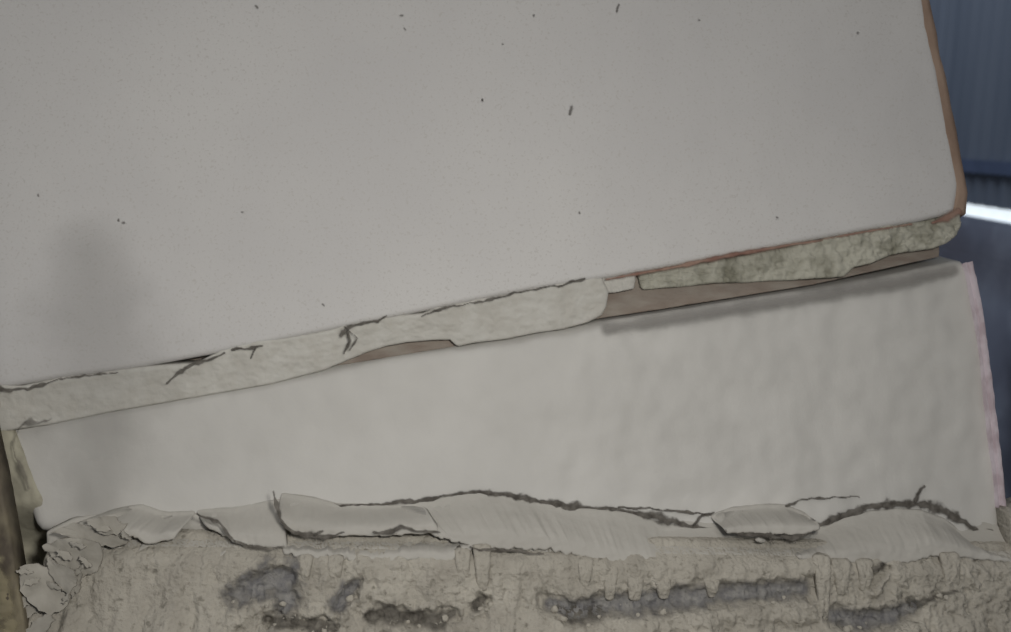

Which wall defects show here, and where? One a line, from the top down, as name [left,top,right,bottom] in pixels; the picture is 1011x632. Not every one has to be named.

crack [421,278,585,317]
crack [340,315,387,354]
crack [0,372,118,393]
crack [166,345,263,384]
crack [197,491,344,551]
crack [336,485,993,544]
peeling [16,516,132,632]
spalling [222,560,337,632]
spalling [330,579,359,611]
spalling [364,605,456,630]
spalling [545,581,808,628]
spalling [828,590,958,632]